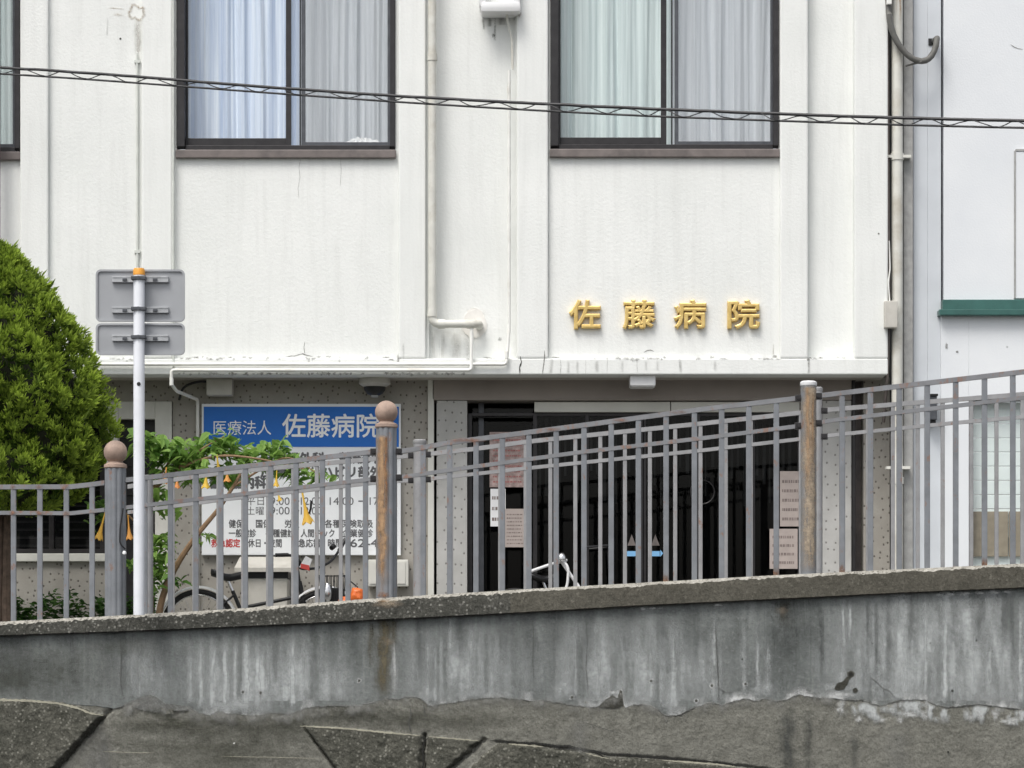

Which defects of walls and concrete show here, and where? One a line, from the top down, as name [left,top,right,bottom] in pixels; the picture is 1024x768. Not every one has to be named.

water stain [189,644,343,714]
water stain [371,621,396,690]
water stain [425,631,475,703]
water stain [559,633,721,708]
peeling [382,671,1024,724]
water stain [730,637,770,702]
water stain [828,591,1024,707]